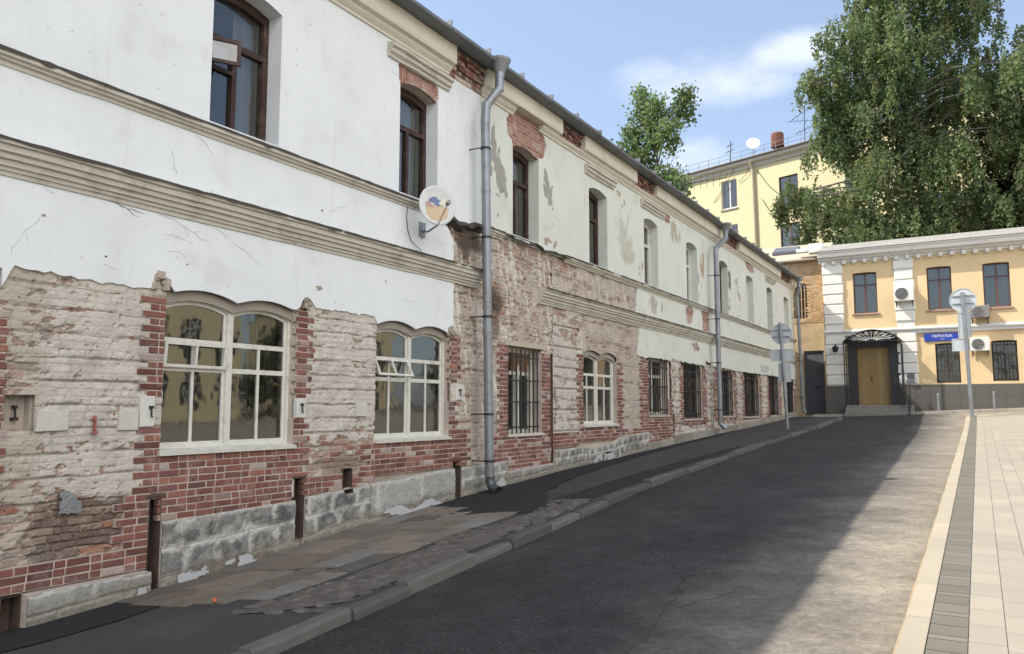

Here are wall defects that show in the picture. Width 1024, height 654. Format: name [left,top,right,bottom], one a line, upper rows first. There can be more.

crack [111,201,259,264]
spalling [398,64,438,102]
spalling [490,111,553,210]
flaking render [0,266,167,569]
flaking render [302,286,377,477]
flaking render [449,226,641,466]